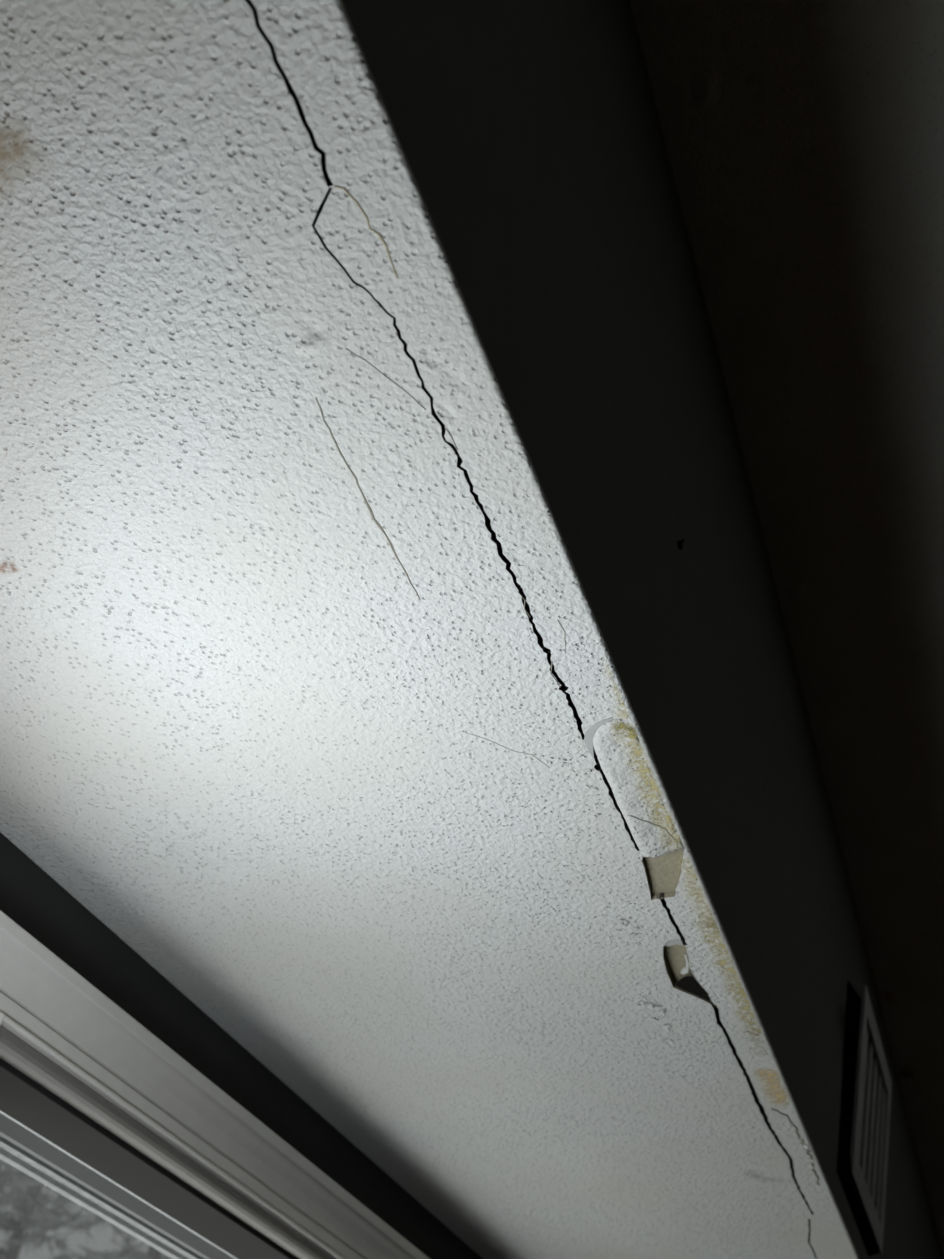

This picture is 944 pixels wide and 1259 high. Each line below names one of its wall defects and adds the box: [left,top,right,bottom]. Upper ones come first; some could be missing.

crack [245,0,640,851]
flaking render [642,850,684,900]
crack [660,893,687,945]
flaking render [663,933,717,1008]
crack [711,1002,817,1259]